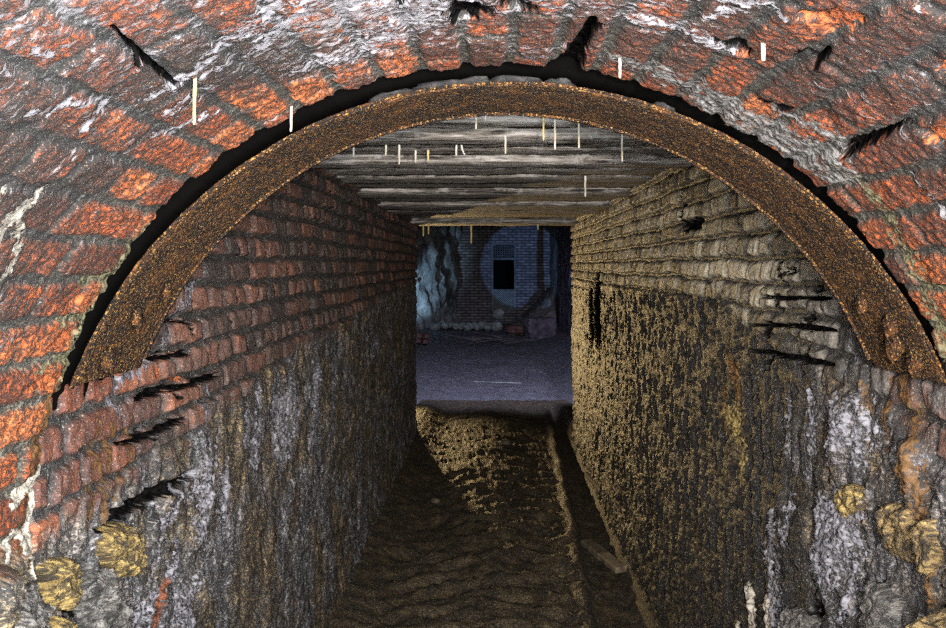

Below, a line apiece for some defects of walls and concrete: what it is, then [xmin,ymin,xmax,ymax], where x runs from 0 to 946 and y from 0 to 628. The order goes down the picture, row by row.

spalling [440,0,539,26]
crack [111,24,193,86]
leakage [0,184,48,283]
leakage [1,463,41,580]
leakage [762,594,774,628]